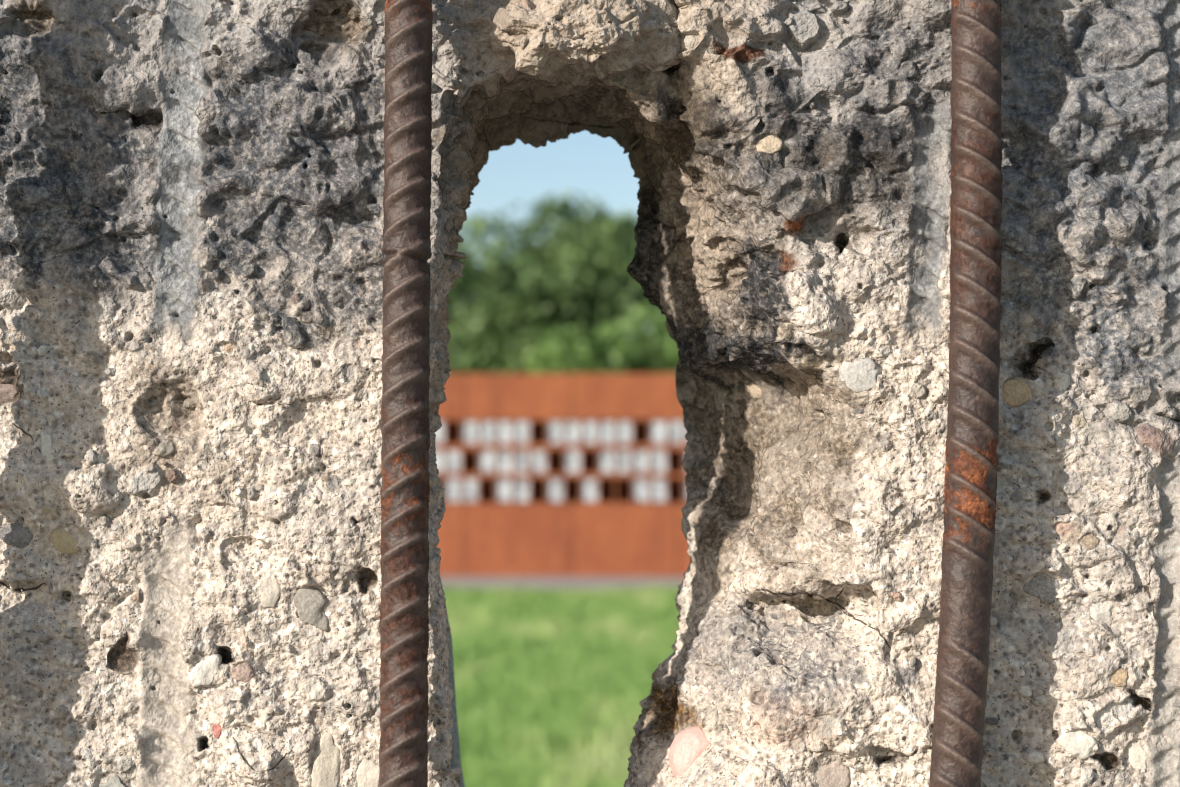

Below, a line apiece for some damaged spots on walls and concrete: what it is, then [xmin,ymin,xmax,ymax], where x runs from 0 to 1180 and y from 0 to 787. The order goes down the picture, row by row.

water stain [0,36,160,288]
water stain [202,40,386,342]
spalling [835,233,849,253]
water stain [1002,0,1171,401]
rust [380,435,430,525]
rust [943,433,999,540]
rust [379,536,429,689]